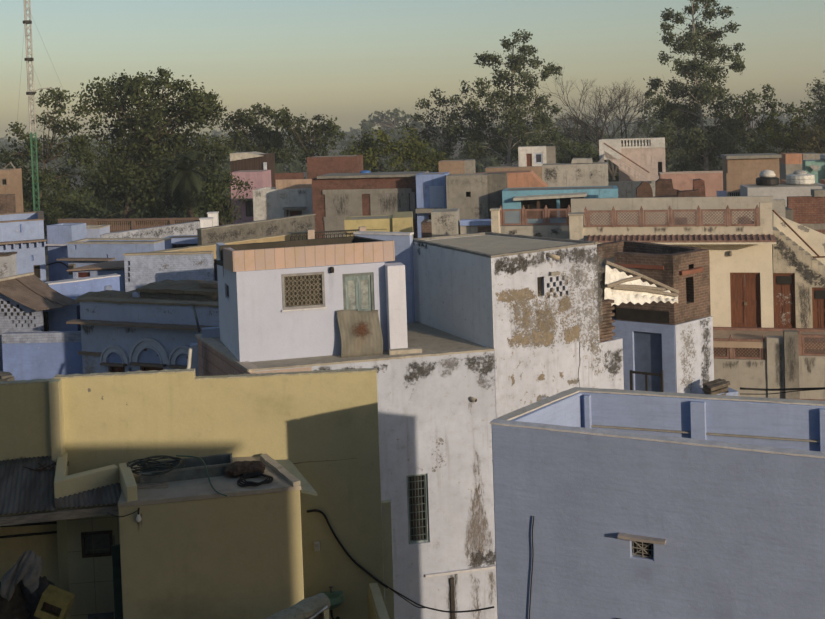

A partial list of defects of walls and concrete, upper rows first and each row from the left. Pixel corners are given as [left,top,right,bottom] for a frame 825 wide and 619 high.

water stain [404,353,496,388]
peeling [495,258,602,372]
water stain [774,234,825,328]
water stain [465,453,496,602]